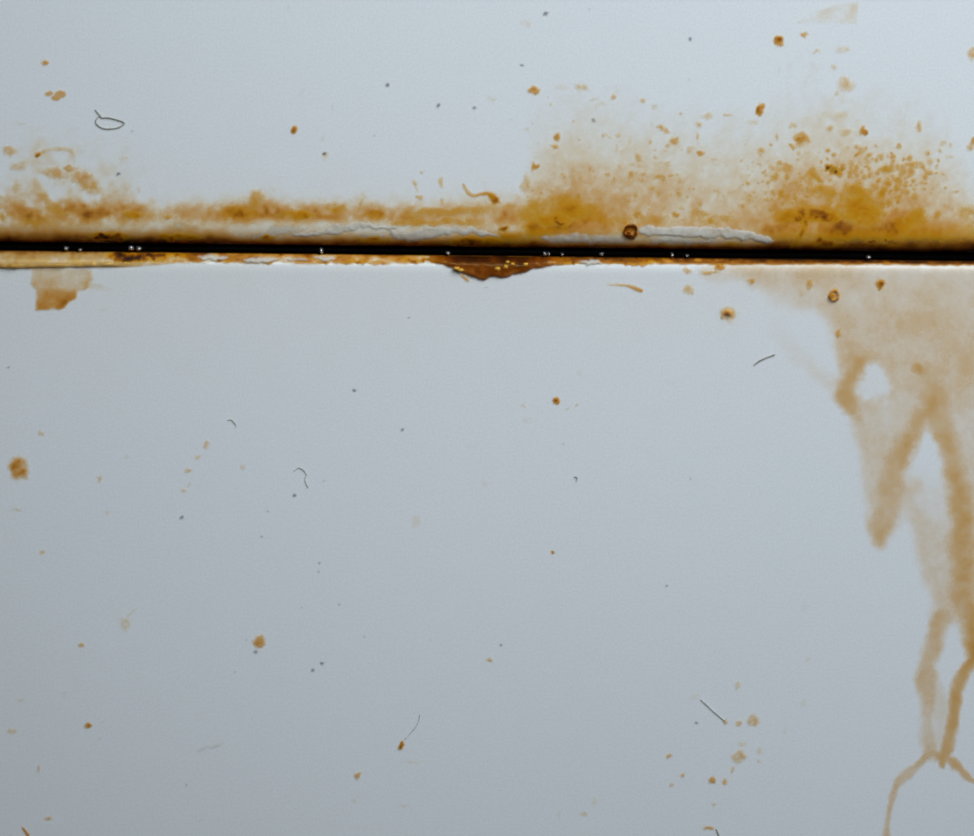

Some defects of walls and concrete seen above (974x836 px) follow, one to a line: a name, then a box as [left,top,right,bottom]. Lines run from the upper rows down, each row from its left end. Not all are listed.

corrosion [790,133,809,149]
corrosion [0,144,974,281]
corrosion [36,287,76,310]
corrosion [10,458,27,478]